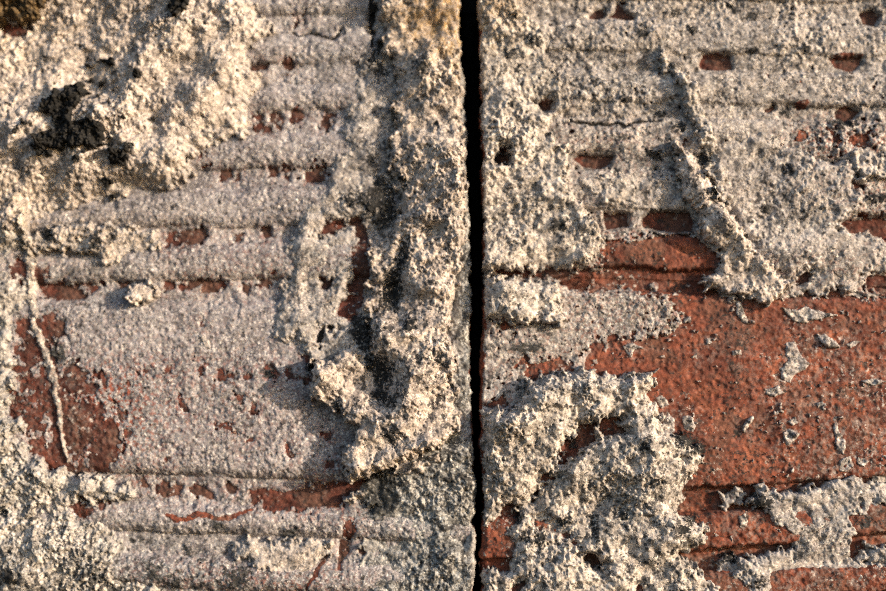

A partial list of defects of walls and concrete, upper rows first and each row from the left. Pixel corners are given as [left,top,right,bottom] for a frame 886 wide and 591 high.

peeling [164,228,208,249]
peeling [9,260,99,301]
peeling [163,277,227,294]
peeling [318,216,370,321]
crack [462,0,487,591]
peeling [9,311,133,474]
peeling [499,209,886,591]
peeling [70,496,109,520]
peeling [135,474,215,500]
peeling [249,479,365,514]
peeling [337,517,365,571]
peeling [481,504,519,572]